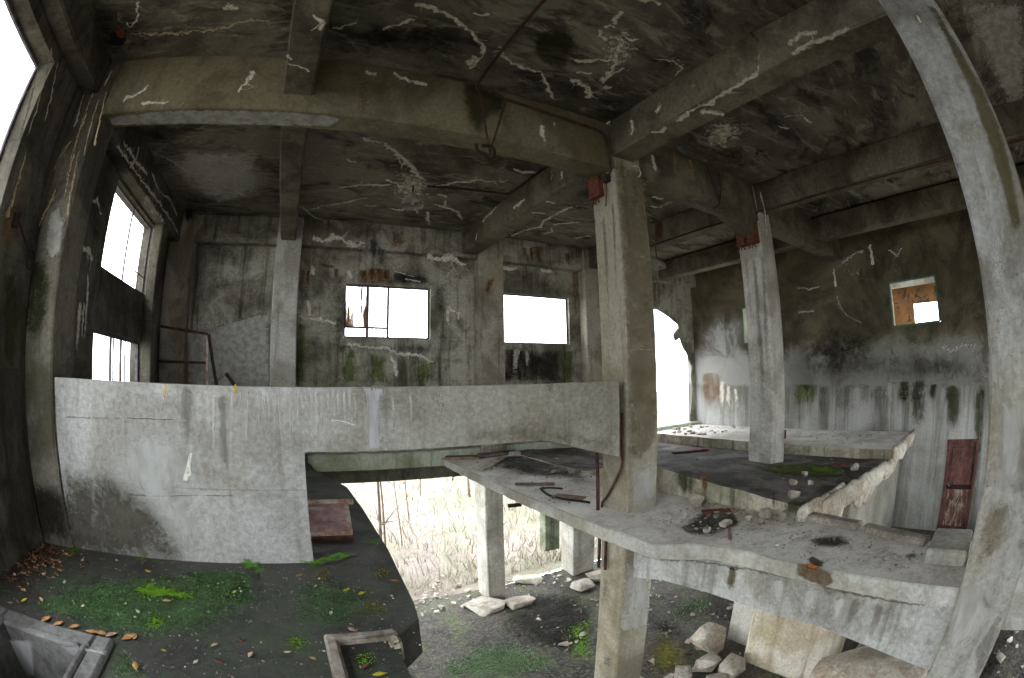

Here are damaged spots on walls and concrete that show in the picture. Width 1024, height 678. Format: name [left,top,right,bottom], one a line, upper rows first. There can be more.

damp [356,28,458,53]
damp [537,30,573,73]
damp [39,71,112,226]
damp [505,349,560,381]
spalling [796,429,917,522]